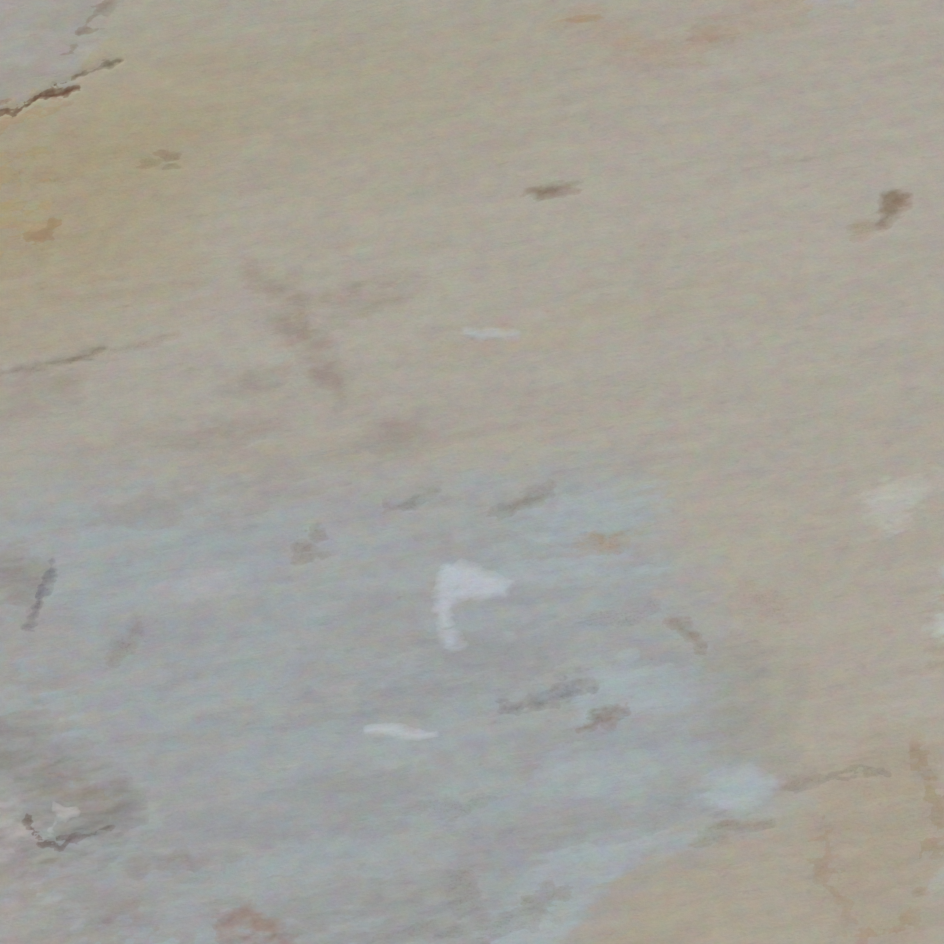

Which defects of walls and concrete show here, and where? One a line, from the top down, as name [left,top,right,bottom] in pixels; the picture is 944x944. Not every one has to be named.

crack [0,59,124,136]
crack [0,330,182,432]
crack [0,535,58,632]
peeling [0,434,807,944]